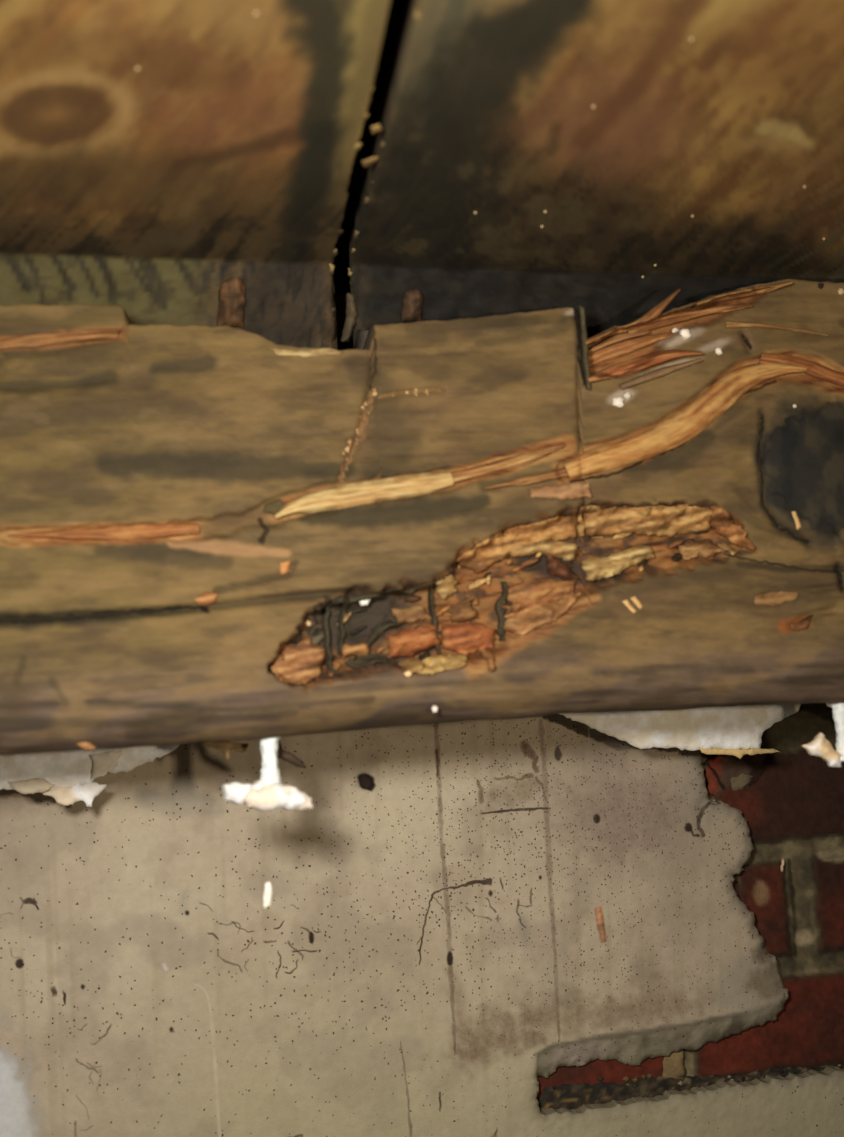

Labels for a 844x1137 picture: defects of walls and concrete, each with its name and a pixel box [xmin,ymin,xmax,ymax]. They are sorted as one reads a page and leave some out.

crack [574,308,585,385]
crack [742,334,752,349]
crack [338,330,439,483]
crack [570,441,687,483]
crack [726,381,843,590]
peeling [9,750,123,807]
spalling [700,748,782,799]
crack [417,879,519,964]